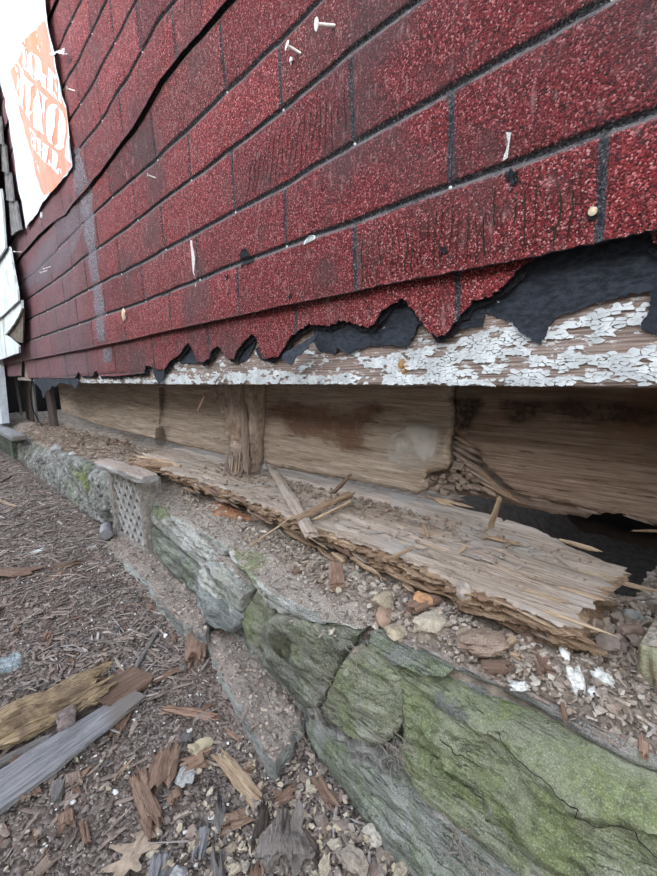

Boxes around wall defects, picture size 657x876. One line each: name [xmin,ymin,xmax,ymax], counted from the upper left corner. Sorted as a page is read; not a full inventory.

peeling [79,301,657,387]
peeling [428,457,500,496]